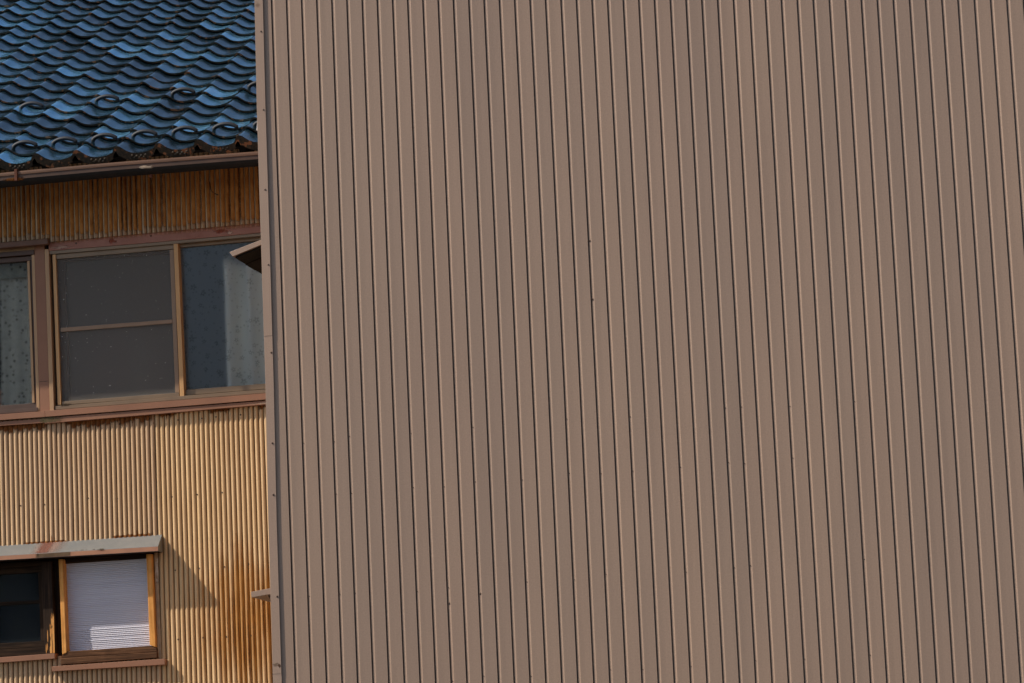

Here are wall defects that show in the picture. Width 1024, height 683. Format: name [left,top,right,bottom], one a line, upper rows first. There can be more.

rust [0,167,260,238]
rust [219,553,281,683]